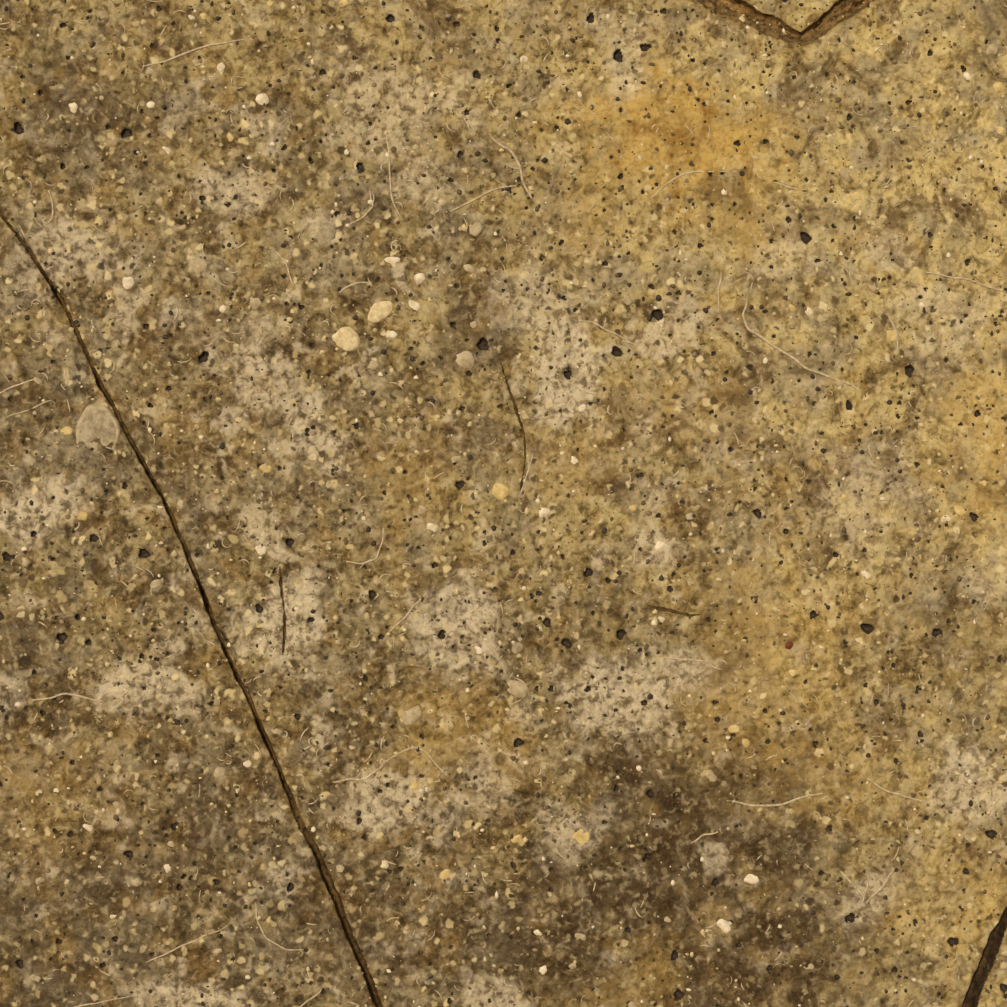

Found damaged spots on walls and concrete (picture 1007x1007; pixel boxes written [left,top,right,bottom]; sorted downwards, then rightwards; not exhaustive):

crack [591,0,896,59]
crack [0,204,390,1007]
crack [958,907,1007,1007]